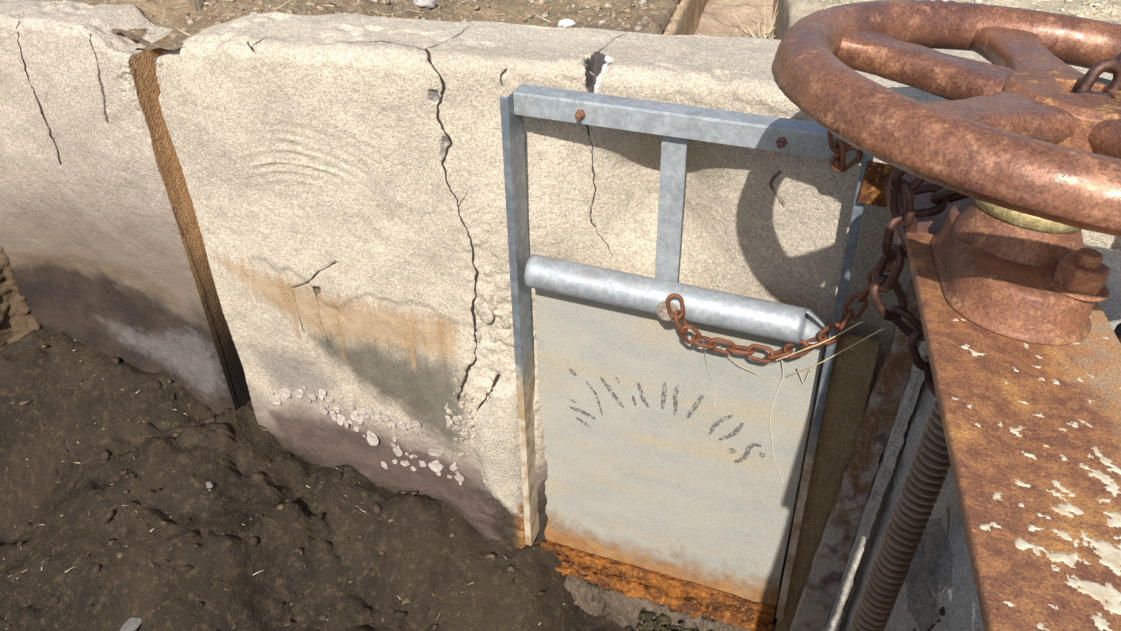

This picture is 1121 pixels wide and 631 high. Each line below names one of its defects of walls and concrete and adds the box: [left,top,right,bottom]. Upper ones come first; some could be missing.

crack [16,21,61,165]
crack [89,33,108,123]
crack [372,25,500,412]
crack [586,125,614,259]
corrosion [518,509,526,549]
corrosion [540,518,779,631]
peeling [1015,444,1121,631]